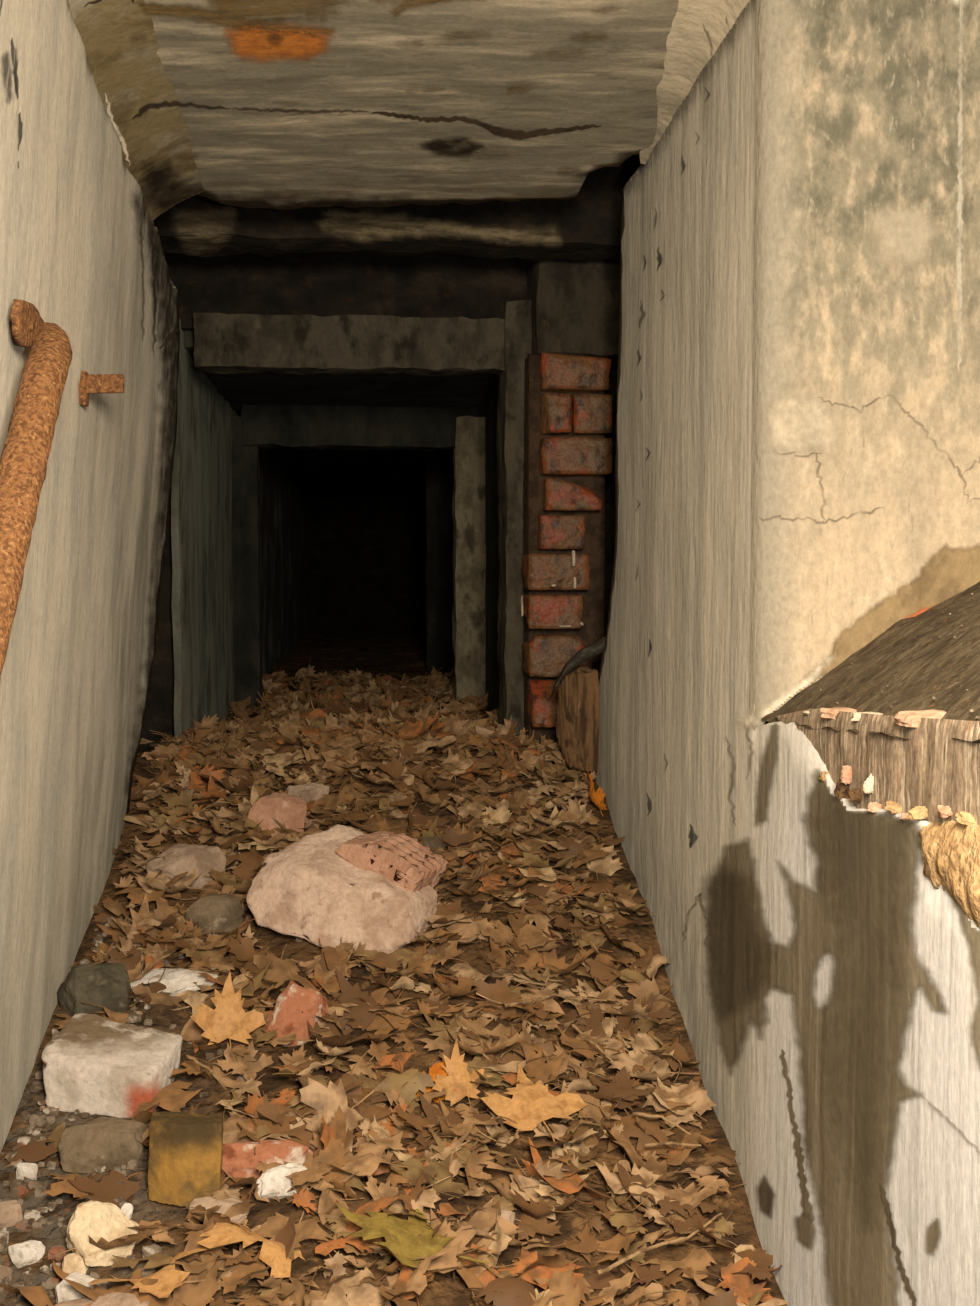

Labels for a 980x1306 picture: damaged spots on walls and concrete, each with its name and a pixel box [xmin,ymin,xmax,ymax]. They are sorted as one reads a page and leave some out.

corrosion [228,26,327,60]
leakage [393,0,450,15]
crack [132,101,601,140]
leakage [756,724,778,823]
spalling [744,546,980,928]
leakage [943,885,980,1063]
leakage [708,770,946,1306]